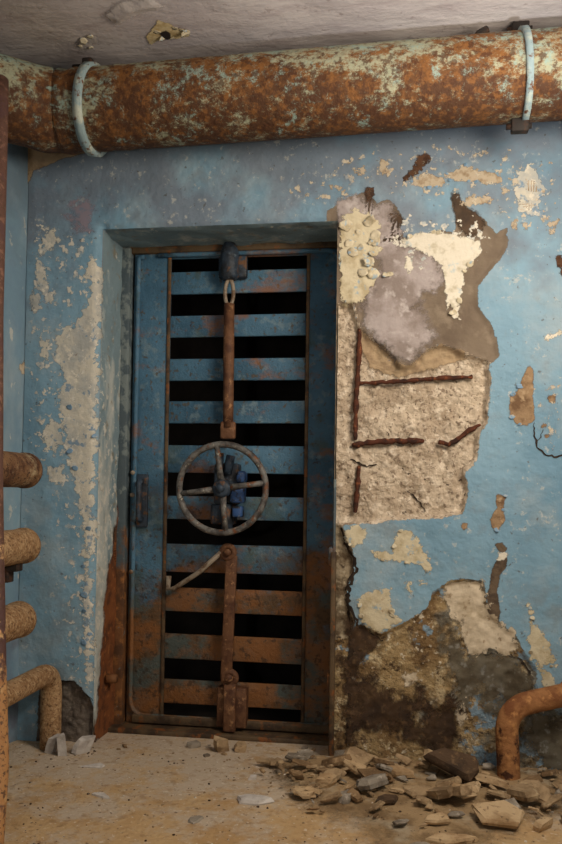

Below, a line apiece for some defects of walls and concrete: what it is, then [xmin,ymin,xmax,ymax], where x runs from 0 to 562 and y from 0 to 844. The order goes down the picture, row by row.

spalling [147,20,190,45]
peeling [18,224,104,742]
spalling [289,144,562,770]
crack [533,424,562,458]
water stain [337,613,534,751]